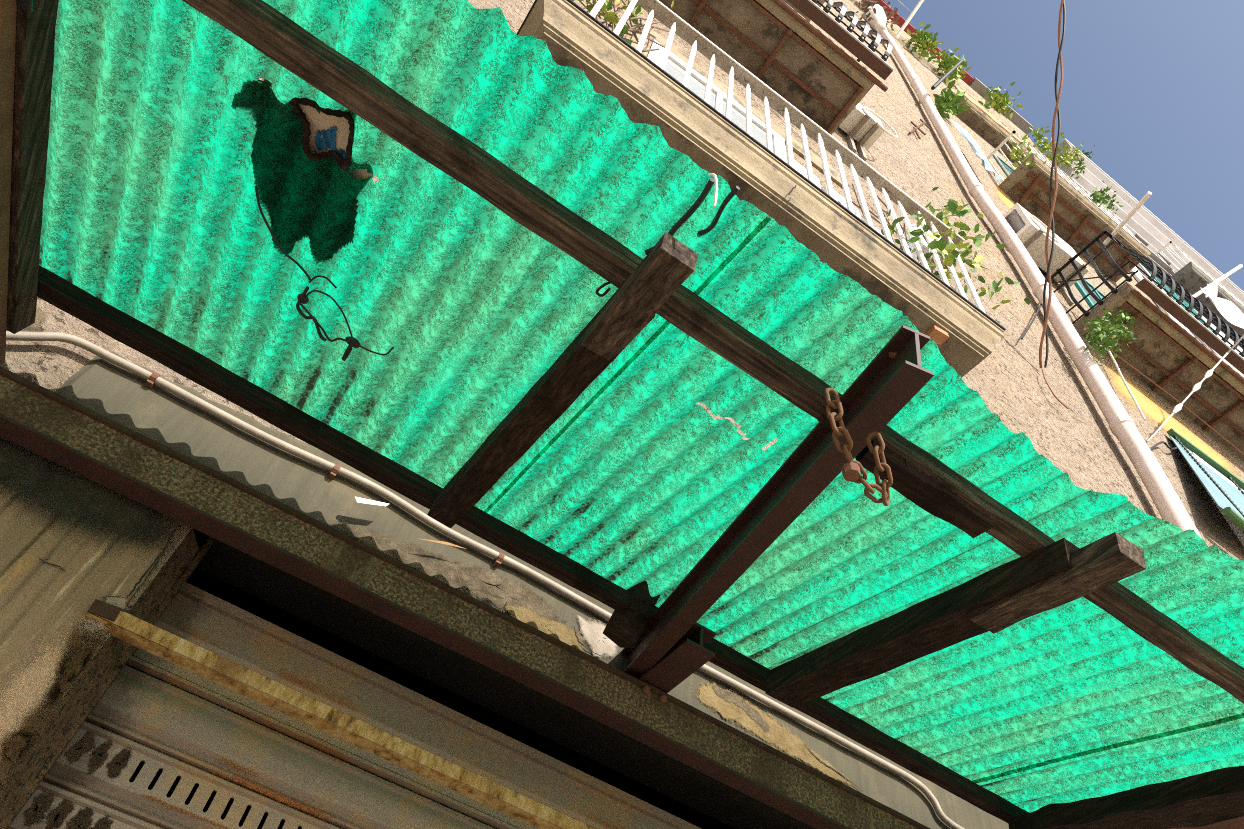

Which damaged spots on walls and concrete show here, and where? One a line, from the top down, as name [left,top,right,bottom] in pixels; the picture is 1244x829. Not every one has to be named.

damp [0,437,174,544]
spalling [331,520,617,658]
spalling [696,681,862,791]